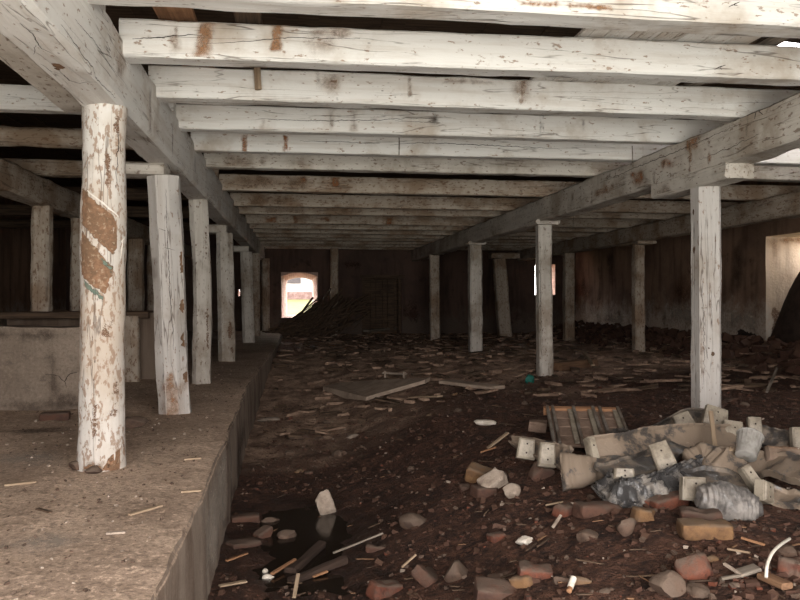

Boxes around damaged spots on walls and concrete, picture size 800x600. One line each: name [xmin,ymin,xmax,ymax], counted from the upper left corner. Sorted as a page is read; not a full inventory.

peeling [81,188,125,300]
peeling [84,449,120,471]